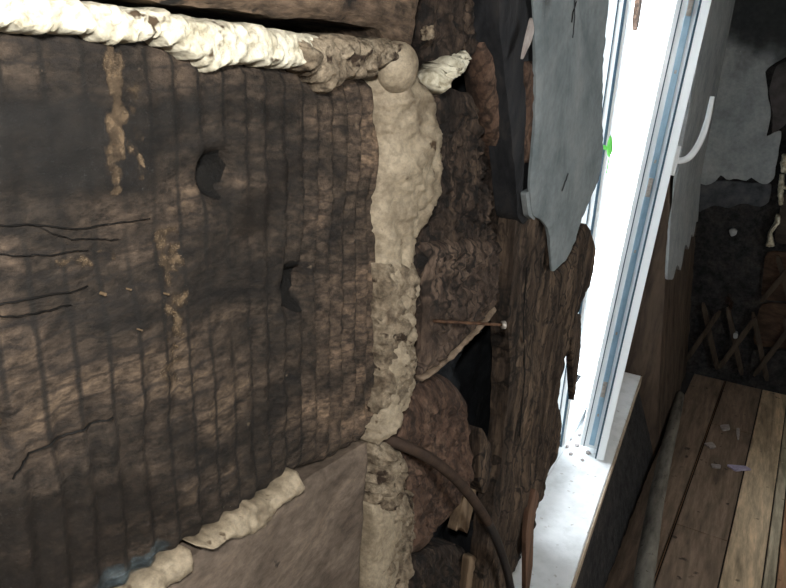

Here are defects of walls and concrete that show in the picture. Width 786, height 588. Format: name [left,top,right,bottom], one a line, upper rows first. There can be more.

flaking render [521,0,609,271]
flaking render [665,0,786,280]
crack [12,417,114,480]
damp [0,491,169,588]